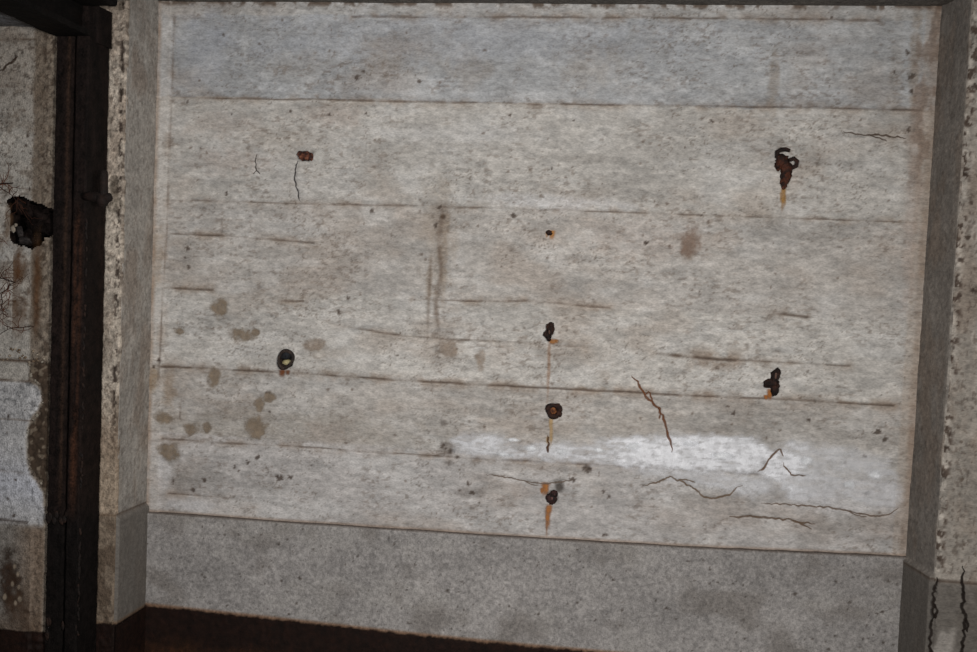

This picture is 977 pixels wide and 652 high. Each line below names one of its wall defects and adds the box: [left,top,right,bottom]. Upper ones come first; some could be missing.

hole [7,195,54,248]
crack [632,377,673,451]
rust [541,484,553,529]
efflorescence [452,435,816,499]
crack [645,449,898,529]
crack [928,566,969,652]